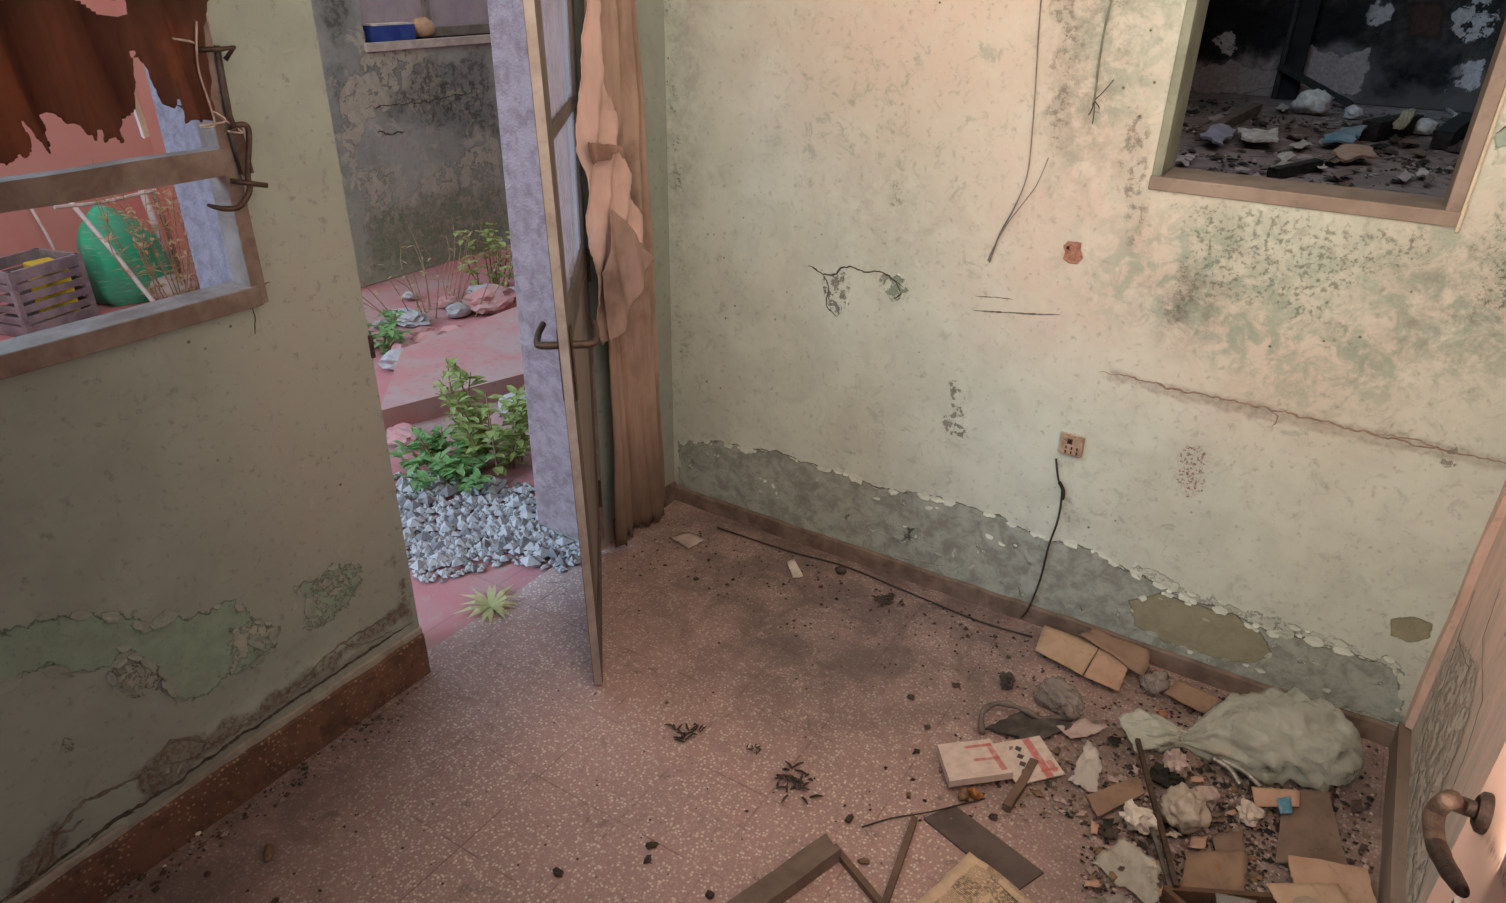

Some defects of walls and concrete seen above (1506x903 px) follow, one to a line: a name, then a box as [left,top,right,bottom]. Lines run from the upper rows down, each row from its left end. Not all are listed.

peeling [1492,124,1506,148]
peeling [820,269,851,317]
peeling [879,273,908,302]
leakage [1185,211,1419,314]
crack [1101,371,1506,464]
peeling [293,560,363,632]
peeling [227,619,281,675]
flaking render [678,439,1478,903]
crack [1407,589,1506,825]